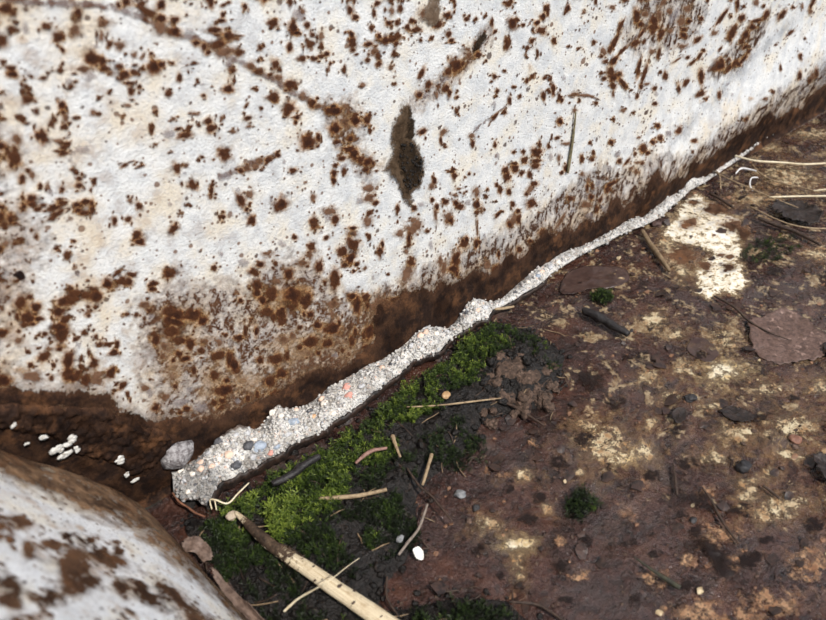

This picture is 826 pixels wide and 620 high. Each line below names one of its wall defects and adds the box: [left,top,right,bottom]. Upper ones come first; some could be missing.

rust [192,0,245,100]
rust [0,16,200,156]
rust [0,43,826,464]
damp [572,431,593,447]
damp [550,455,570,468]
damp [644,470,659,481]
rust [0,428,245,620]
damp [726,502,759,518]
damp [802,516,826,532]
damp [738,536,779,569]